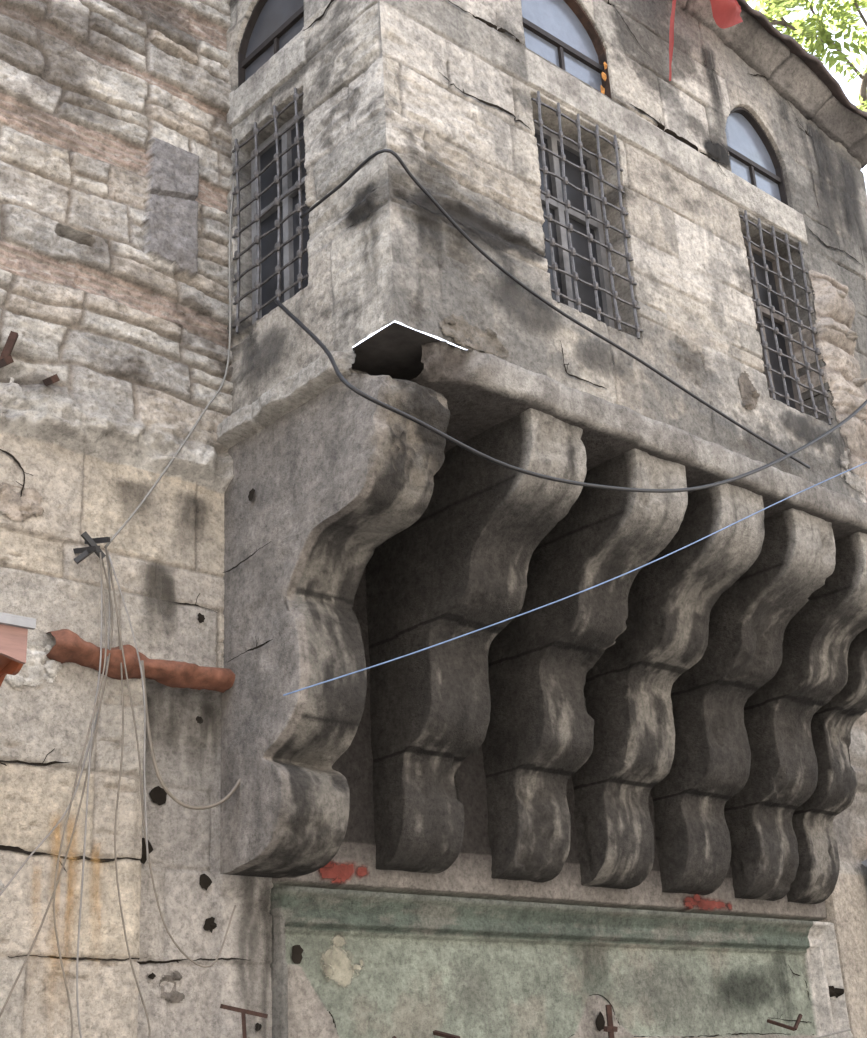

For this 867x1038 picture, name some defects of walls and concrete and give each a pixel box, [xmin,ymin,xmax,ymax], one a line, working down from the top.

spalling [0,377,27,412]
spalling [840,448,867,499]
spalling [0,482,44,522]
peeling [321,934,364,987]